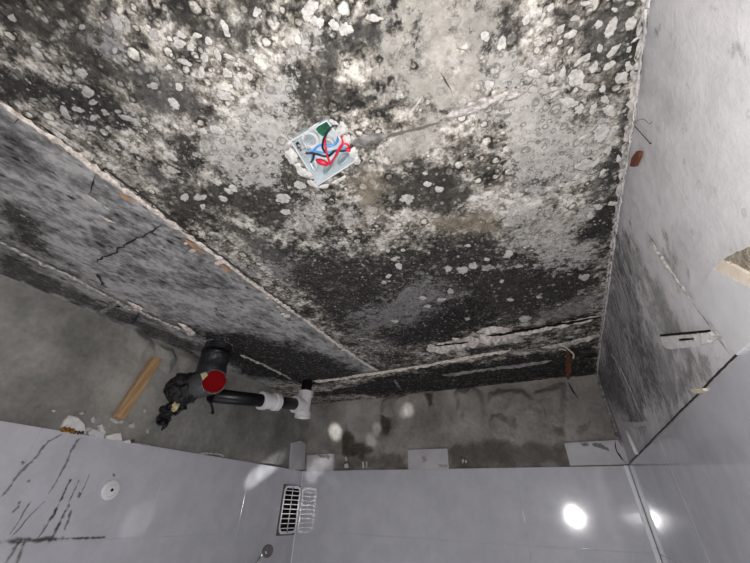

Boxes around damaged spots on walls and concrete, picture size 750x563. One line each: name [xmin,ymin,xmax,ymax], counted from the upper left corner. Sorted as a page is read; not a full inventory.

damp [0,0,709,438]
crack [93,225,161,288]
peeling [380,238,406,284]
peeling [444,257,490,275]
peeling [418,288,454,308]
spalling [426,315,602,354]
damp [9,479,84,559]